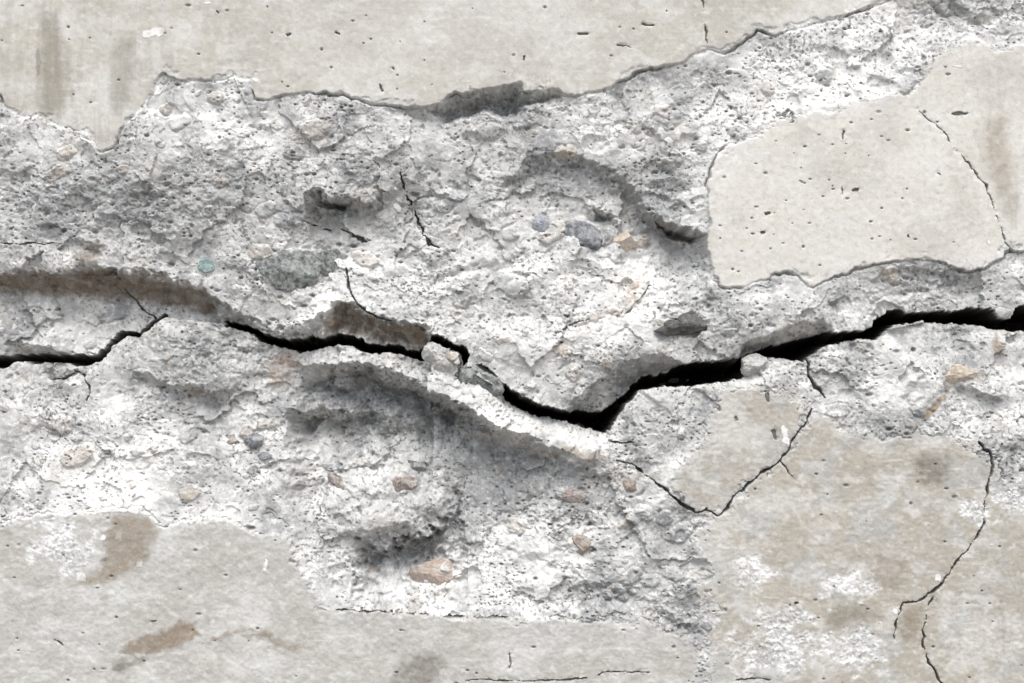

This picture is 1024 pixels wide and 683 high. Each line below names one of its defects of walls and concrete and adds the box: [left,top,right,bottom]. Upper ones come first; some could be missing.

spalling [0,0,1024,412]
crack [921,113,1010,249]
crack [0,287,169,402]
spalling [0,320,1024,683]
crack [224,268,1024,517]
crack [893,441,995,683]